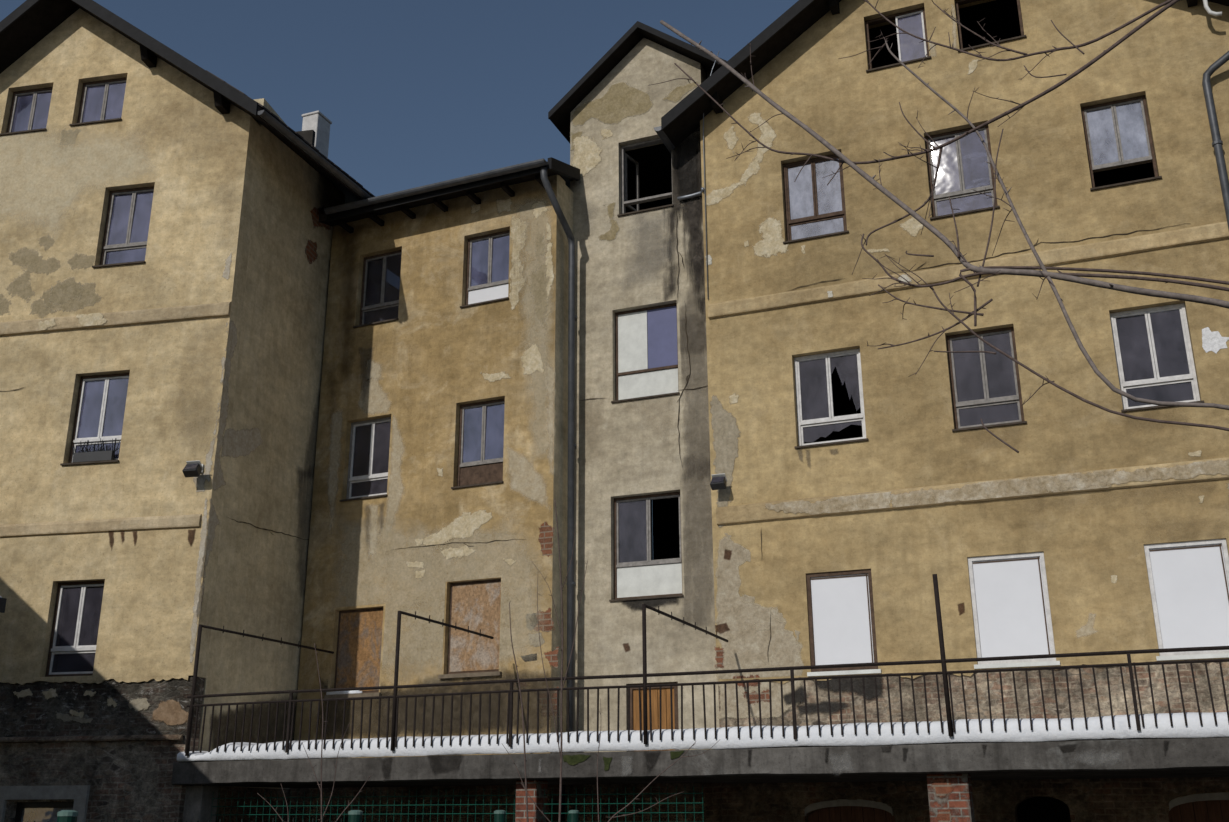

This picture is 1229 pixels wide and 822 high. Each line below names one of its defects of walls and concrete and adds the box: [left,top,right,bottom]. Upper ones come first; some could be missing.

flaking render [0,133,141,222]
peeling [571,81,698,176]
flaking render [706,113,777,206]
flaking render [0,235,107,330]
flaking render [496,198,554,315]
water stain [665,198,704,300]
flaking render [744,218,805,258]
crack [892,223,1191,273]
flaking render [342,344,559,668]
flaking render [710,393,740,507]
flaking render [765,450,1229,515]
flaking render [715,525,1227,719]